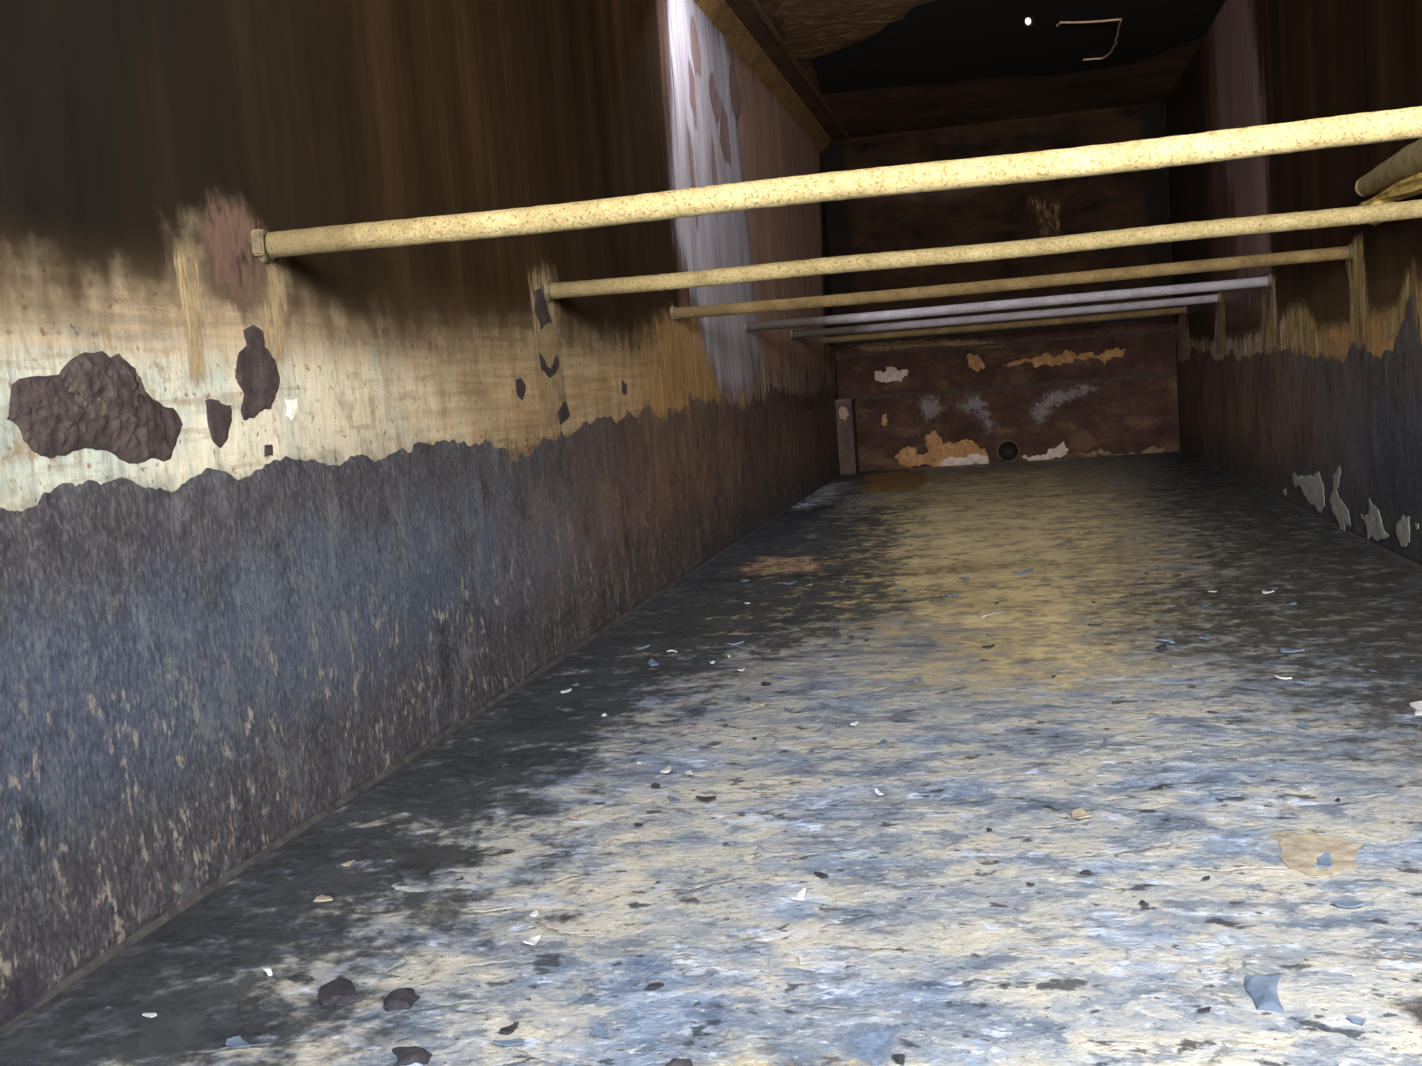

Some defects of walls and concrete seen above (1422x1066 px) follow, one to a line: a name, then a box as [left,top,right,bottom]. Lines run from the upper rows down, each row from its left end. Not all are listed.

leakage [1175,241,1422,364]
peeling [205,324,299,448]
leakage [0,251,837,511]
peeling [1282,466,1419,547]
leakage [381,844,480,871]